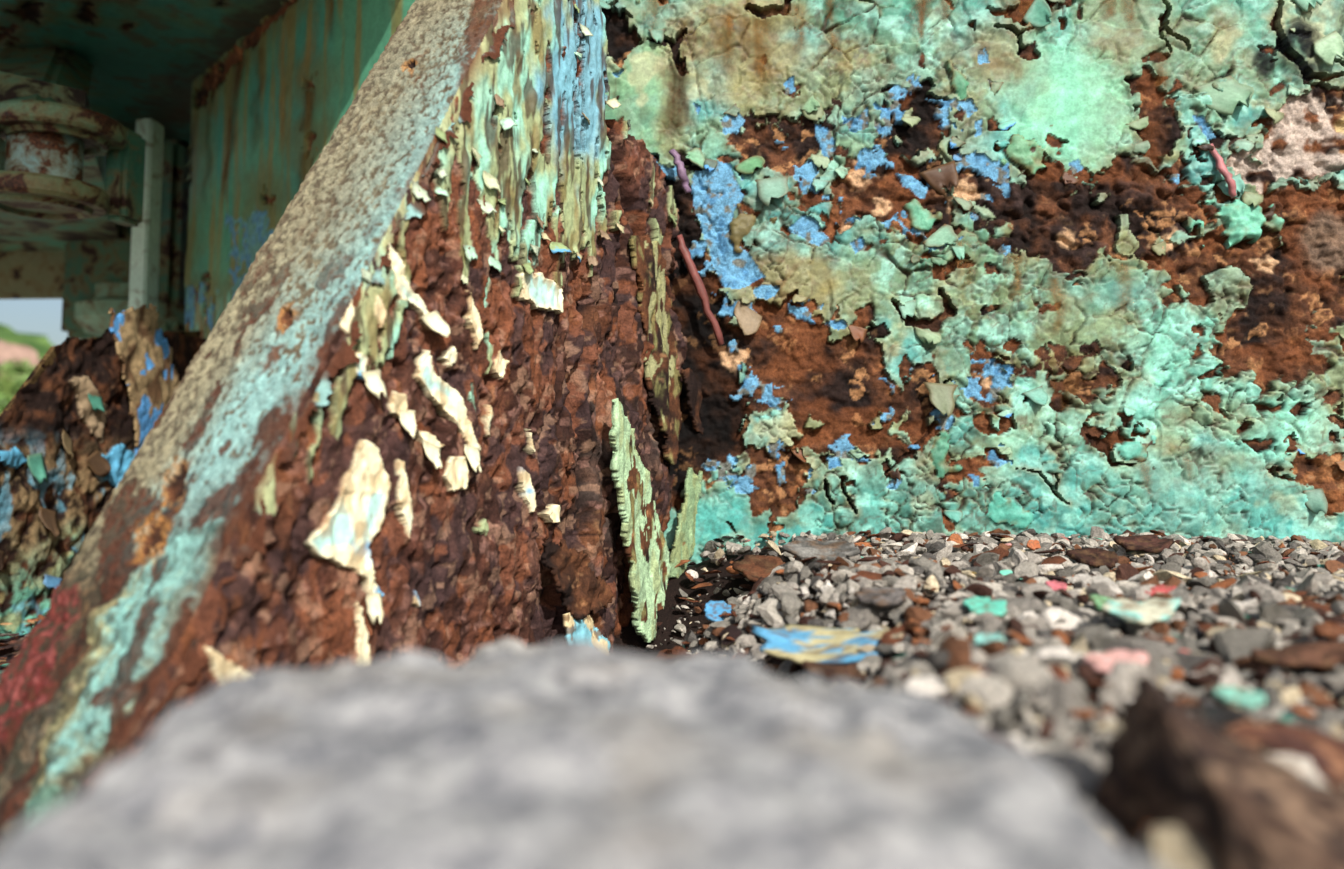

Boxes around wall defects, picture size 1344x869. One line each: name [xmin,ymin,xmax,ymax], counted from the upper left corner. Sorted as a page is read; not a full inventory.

crack [659,0,688,76]
crack [745,0,792,19]
crack [1158,0,1191,53]
crack [1269,0,1344,85]
peeling [290,0,667,491]
rust [277,309,293,333]
peeling [649,47,1344,533]
rust [609,234,704,643]
rust [135,463,188,560]
peeling [306,439,413,662]
peeling [751,624,889,665]
peeling [1089,584,1181,626]